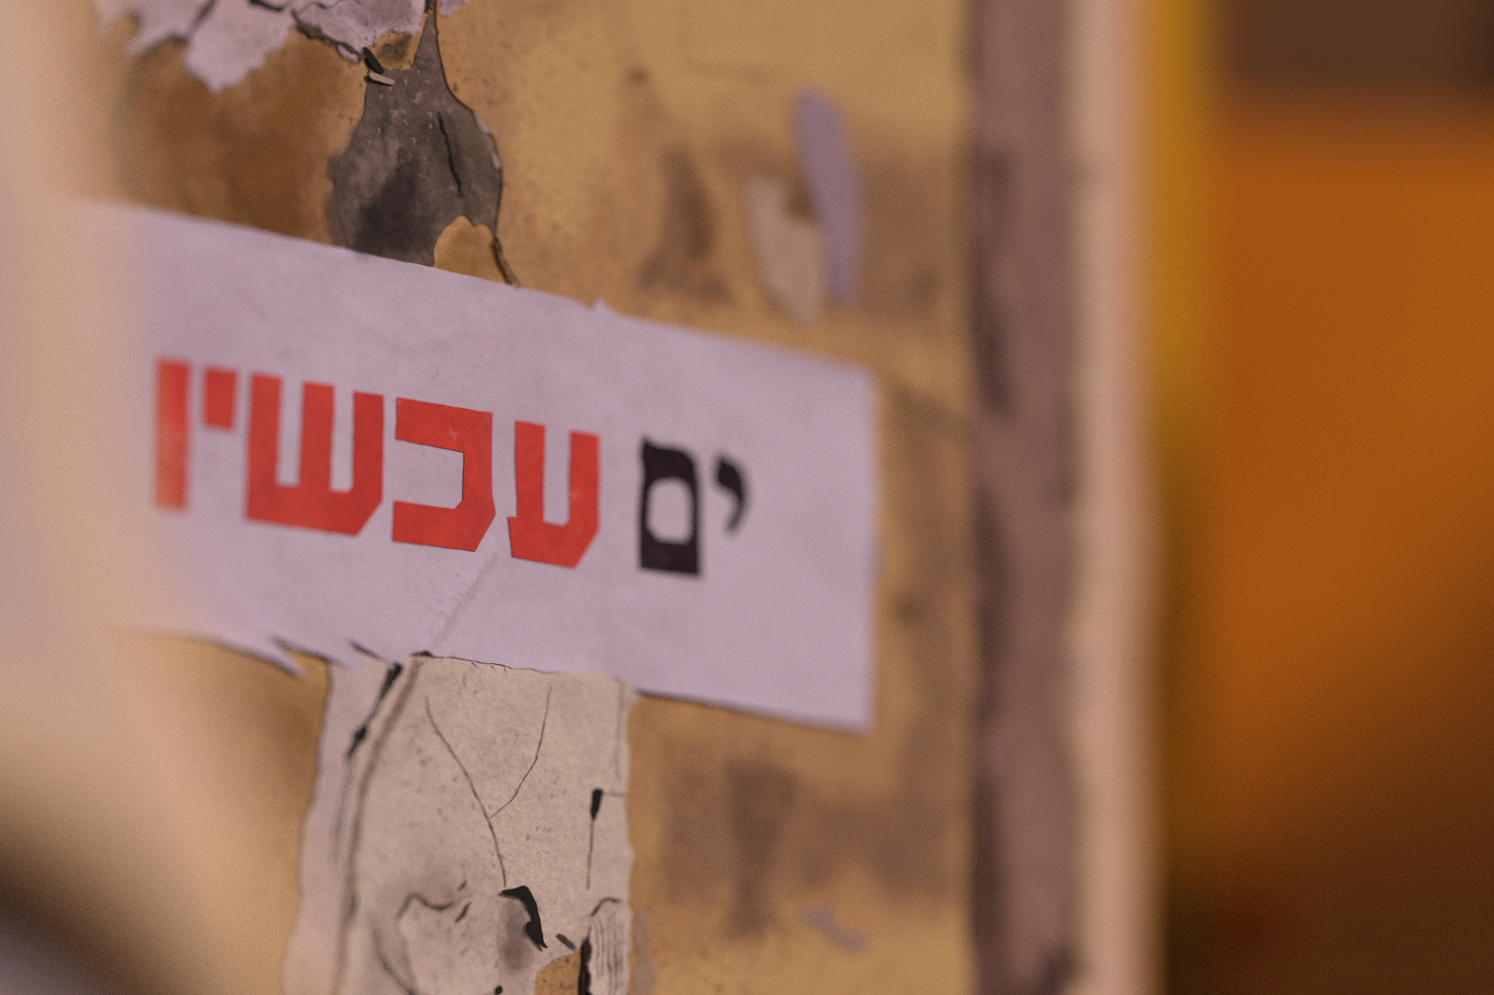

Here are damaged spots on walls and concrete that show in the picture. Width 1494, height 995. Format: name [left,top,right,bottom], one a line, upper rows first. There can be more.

spalling [97,0,517,283]
damp [353,0,412,60]
flaking render [290,645,642,995]